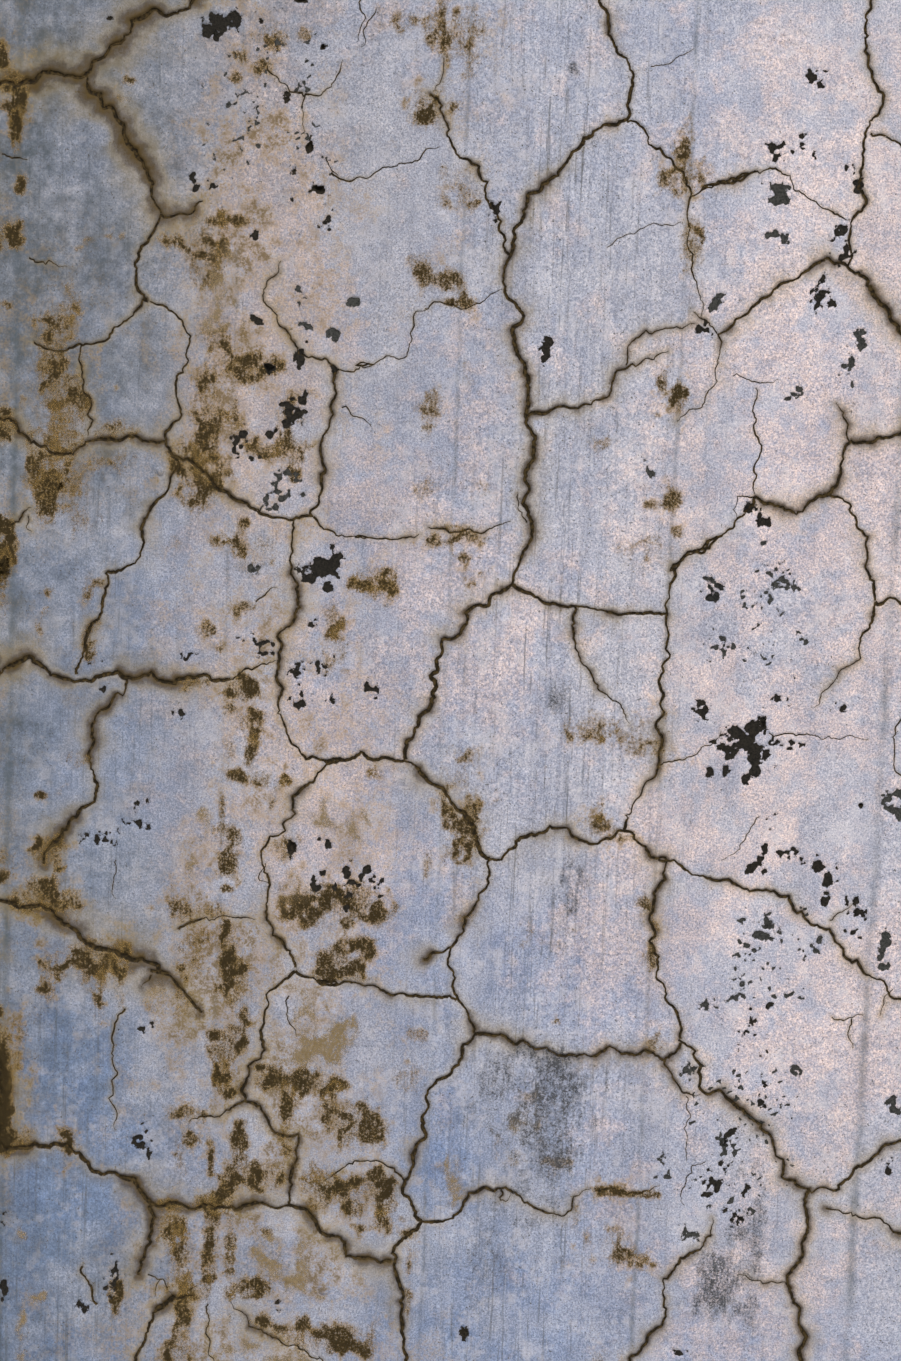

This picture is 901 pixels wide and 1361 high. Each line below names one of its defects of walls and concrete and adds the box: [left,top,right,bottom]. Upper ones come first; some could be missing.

crack [0,0,203,436]
crack [262,261,418,372]
corrosion [168,326,314,511]
corrosion [160,796,251,1100]
corrosion [278,881,399,981]
crack [0,301,700,1361]
crack [403,0,901,1361]
peeling [706,716,806,785]
peeling [699,907,824,1052]
peeling [745,813,895,971]
corrosion [156,1063,413,1361]
peeling [679,1061,802,1228]